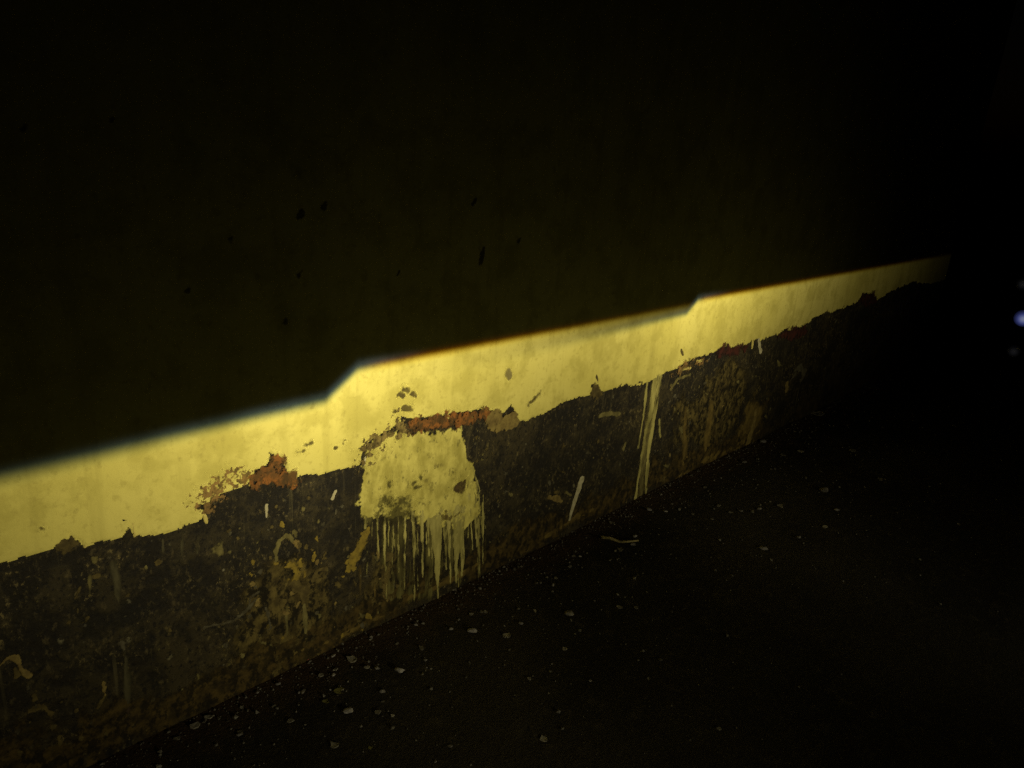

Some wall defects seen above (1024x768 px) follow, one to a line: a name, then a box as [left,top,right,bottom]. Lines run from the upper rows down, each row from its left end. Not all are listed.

leakage [0,359,751,768]